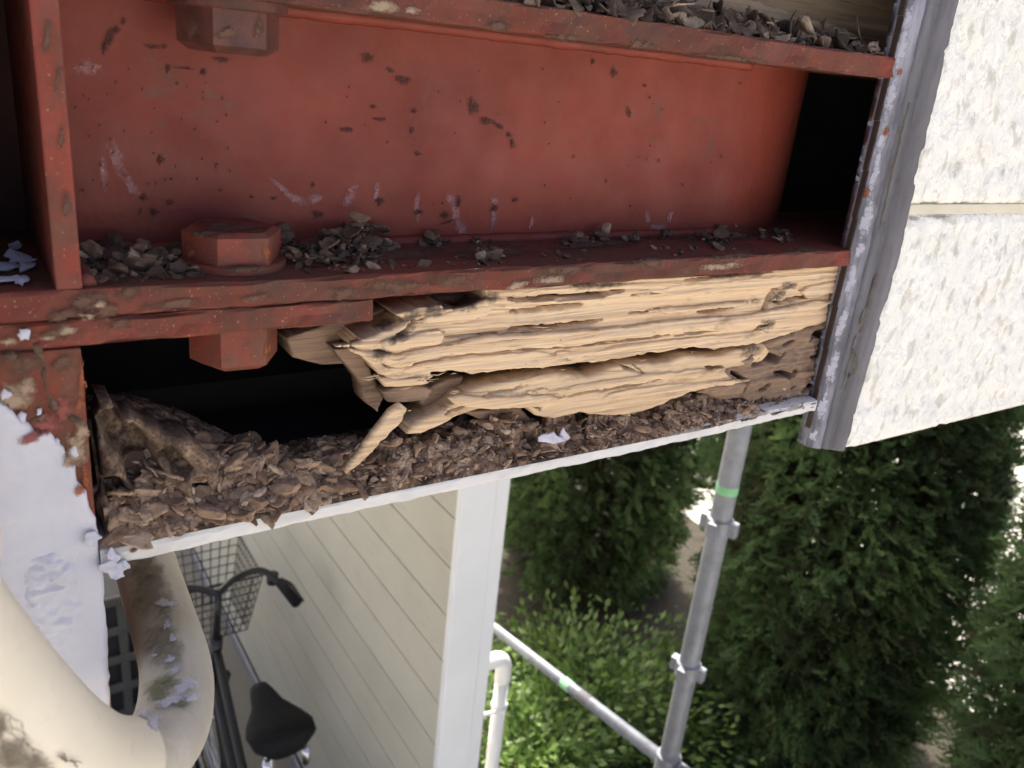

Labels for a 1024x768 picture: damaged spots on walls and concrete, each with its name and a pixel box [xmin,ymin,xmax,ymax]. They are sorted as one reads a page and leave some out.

rust [369,1,417,14]
peeling [0,378,90,467]